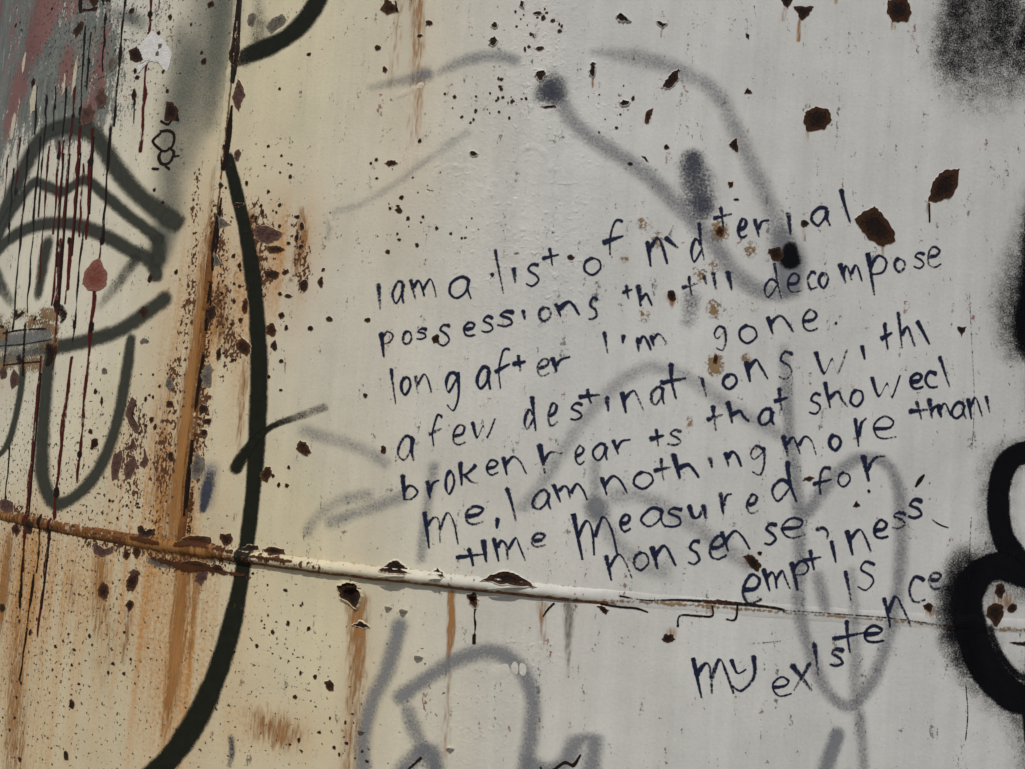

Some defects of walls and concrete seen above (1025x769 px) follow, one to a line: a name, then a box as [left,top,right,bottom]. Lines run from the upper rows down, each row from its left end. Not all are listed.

peeling [380,0,400,16]
rust [411,0,422,57]
rust [0,168,323,767]
peeling [378,559,411,577]
peeling [428,566,446,580]
peeling [465,569,536,610]
rust [347,597,367,704]